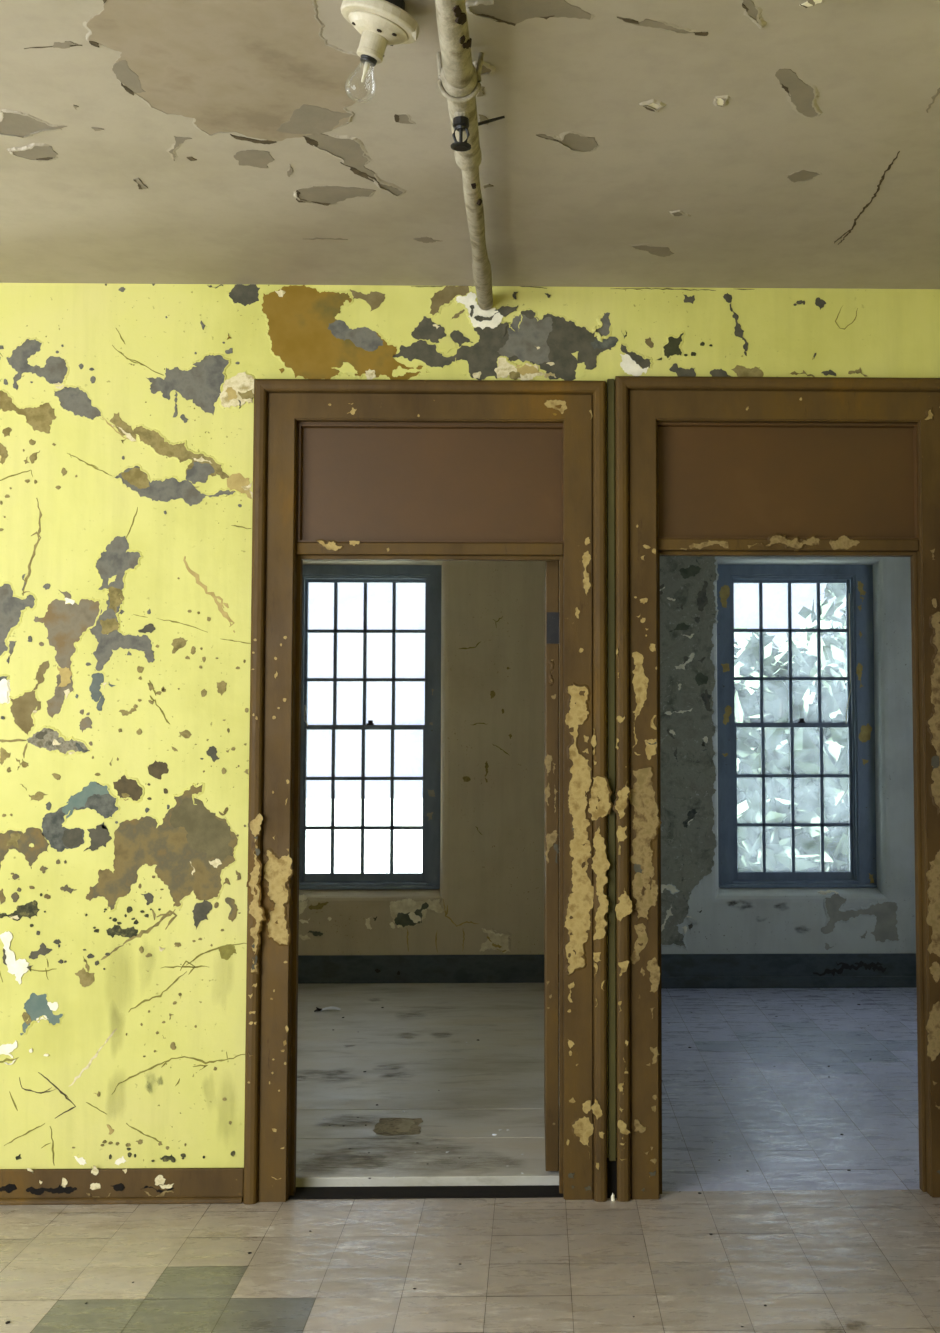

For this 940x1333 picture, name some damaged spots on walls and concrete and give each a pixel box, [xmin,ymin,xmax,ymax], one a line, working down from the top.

peeling [0,109,67,161]
peeling [83,0,407,206]
peeling [453,0,595,97]
crack [834,151,900,245]
peeling [207,284,764,381]
peeling [0,333,256,531]
peeling [926,598,940,815]
peeling [0,536,332,1025]
peeling [544,537,732,1018]
peeling [0,931,110,1065]
spalling [0,1124,186,1197]
crack [0,1052,245,1164]